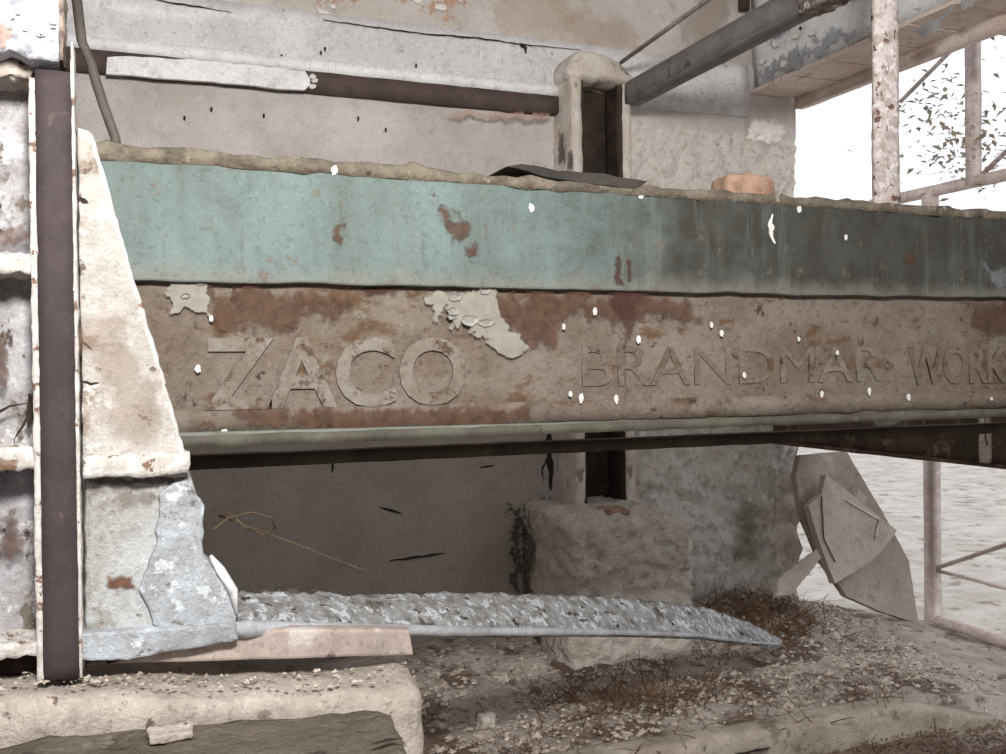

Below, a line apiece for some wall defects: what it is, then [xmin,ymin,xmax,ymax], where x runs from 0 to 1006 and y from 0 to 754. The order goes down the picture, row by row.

peeling [106,56,318,91]
peeling [758,0,856,84]
rust [438,204,477,257]
peeling [166,283,211,316]
peeling [424,288,529,358]
rust [497,256,699,347]
spalling [70,42,185,678]
rust [108,576,135,589]